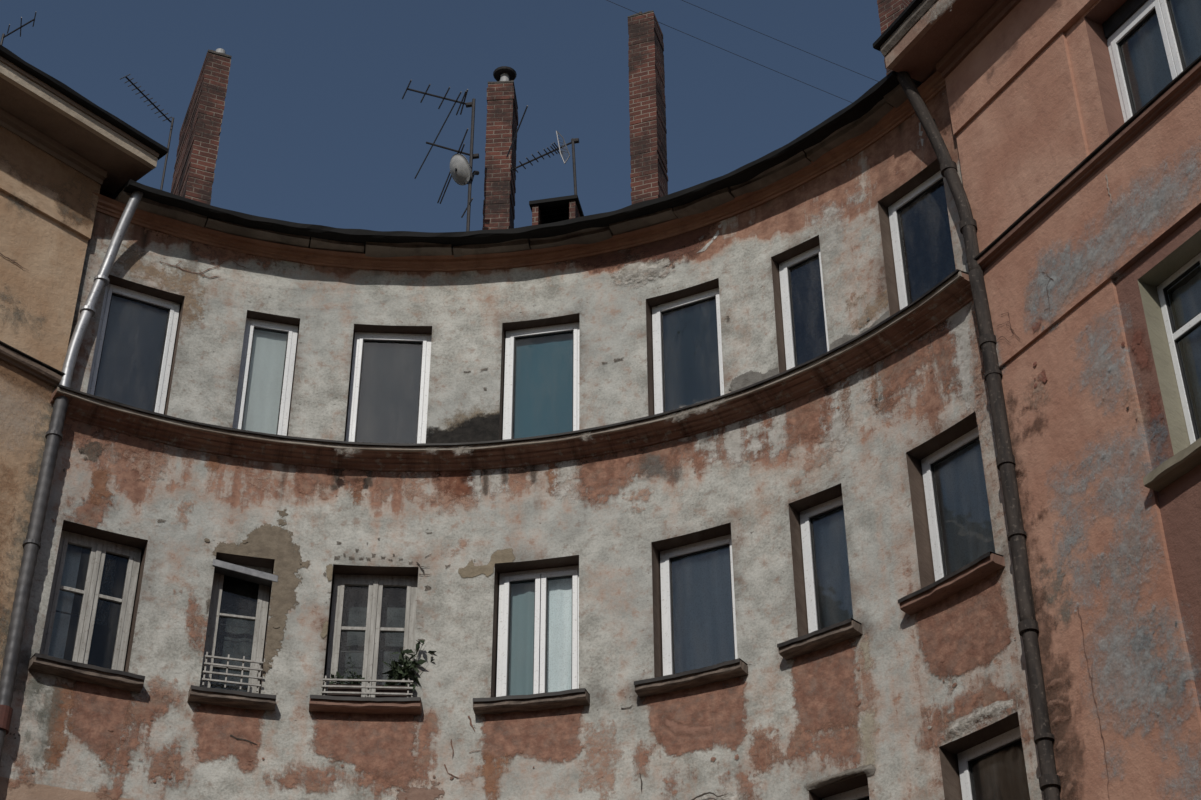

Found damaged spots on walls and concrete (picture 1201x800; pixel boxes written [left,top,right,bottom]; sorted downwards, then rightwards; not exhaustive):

damp [426,411,499,443]
peeling [576,388,839,512]
flaking render [204,509,311,677]
flaking render [323,538,413,581]
peeling [68,635,875,800]
peeling [915,570,1033,754]